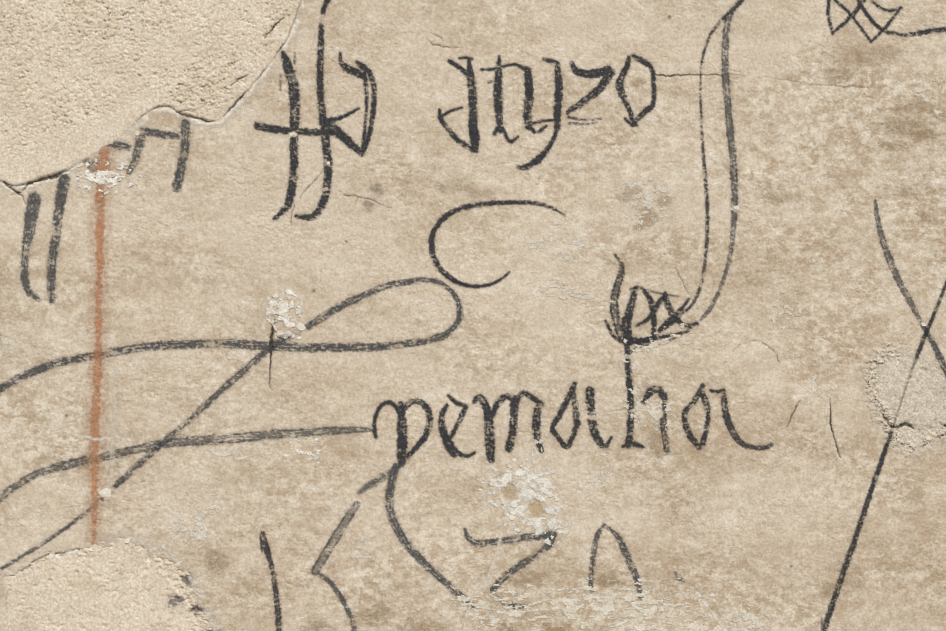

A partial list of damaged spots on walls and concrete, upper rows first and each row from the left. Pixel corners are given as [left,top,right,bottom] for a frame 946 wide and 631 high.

crack [4,171,65,195]
rust [97,146,110,171]
spalling [0,0,305,196]
rust [90,185,105,542]
peeling [266,289,306,341]
spalling [866,342,946,455]
peeling [477,422,572,546]
spalling [3,494,221,631]